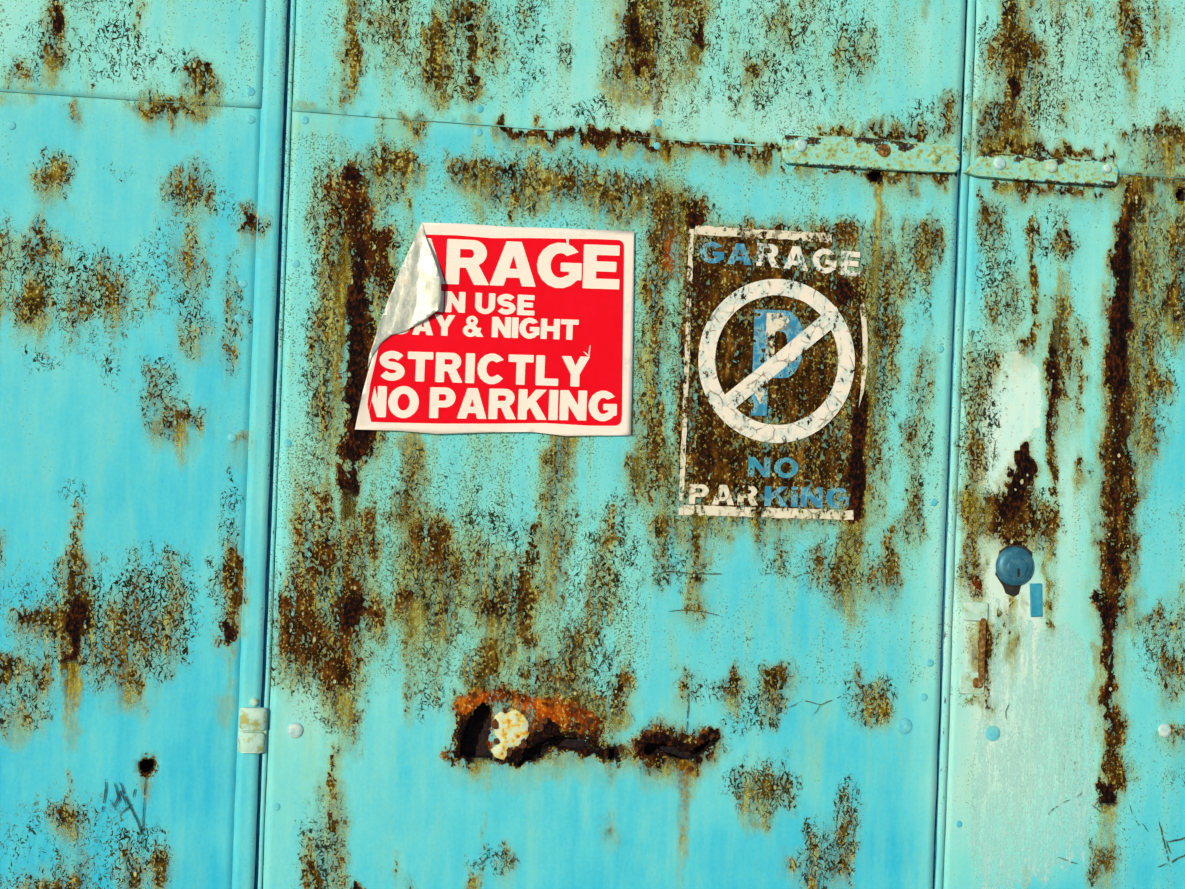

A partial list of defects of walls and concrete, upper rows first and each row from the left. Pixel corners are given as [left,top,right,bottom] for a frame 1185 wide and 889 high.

rust [3,0,227,130]
rust [0,145,273,452]
rust [261,0,881,889]
rust [749,208,946,616]
rust [816,0,1185,887]
rust [0,770,172,889]
rust [0,466,250,739]
spalling [460,691,715,772]